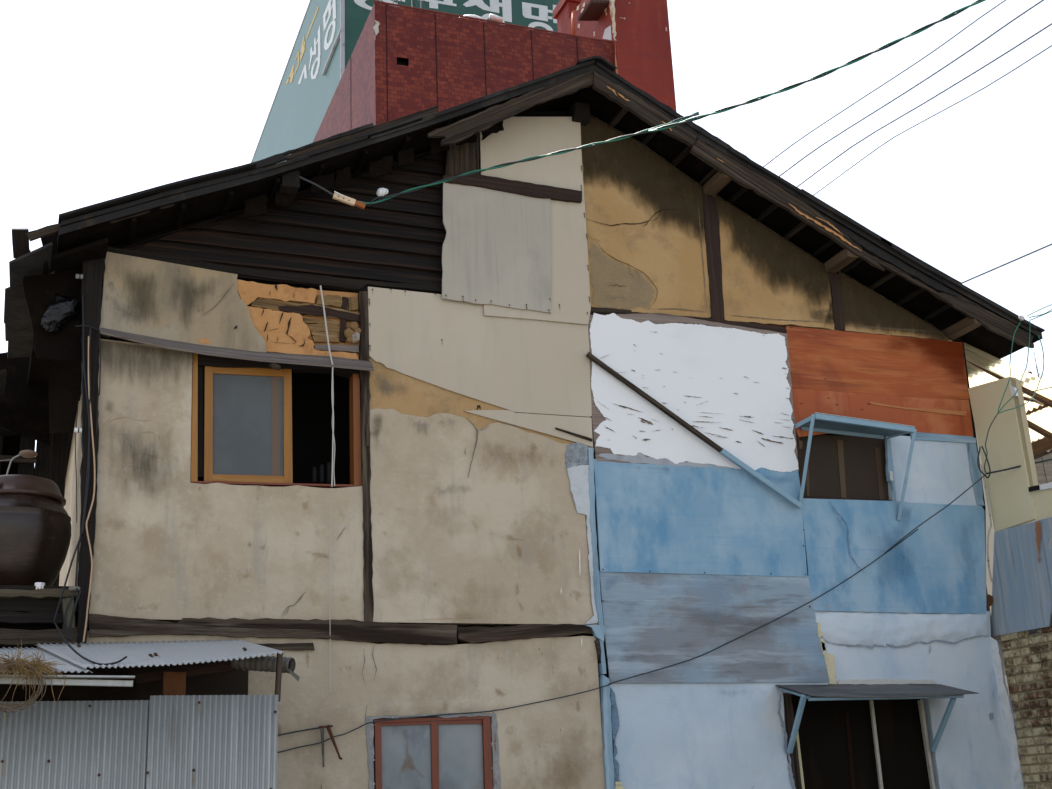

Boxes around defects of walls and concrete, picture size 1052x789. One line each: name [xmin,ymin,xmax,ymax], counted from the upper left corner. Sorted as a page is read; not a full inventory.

peeling [604,0,625,41]
crack [588,207,688,310]
damp [581,114,965,376]
damp [101,340,193,366]
flaking render [237,279,574,445]
peeling [588,313,798,472]